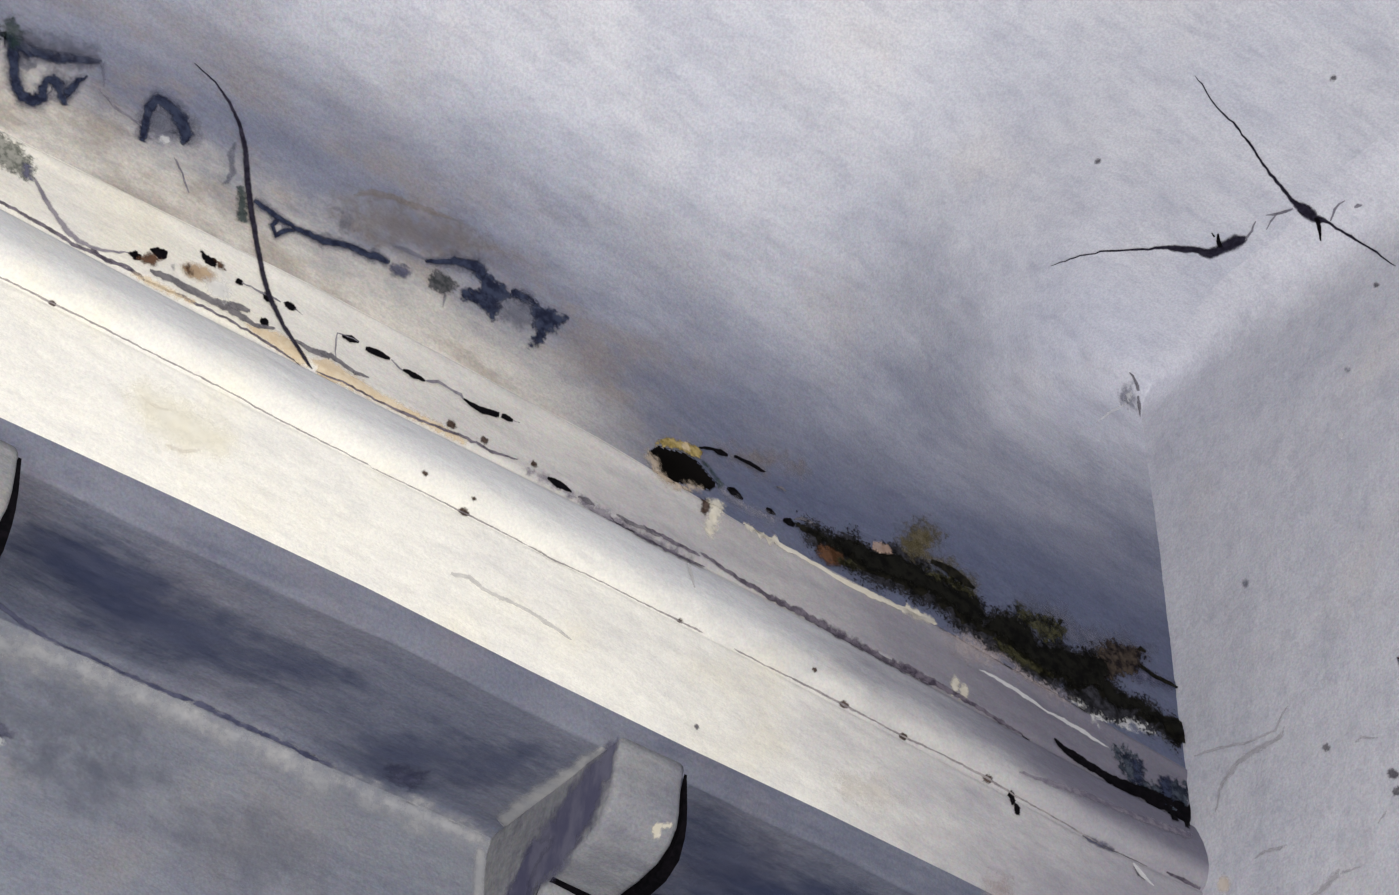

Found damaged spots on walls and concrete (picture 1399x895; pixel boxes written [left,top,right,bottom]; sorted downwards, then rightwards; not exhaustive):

crack [0,63,520,459]
crack [1052,76,1396,266]
crack [0,277,703,639]
spalling [646,437,766,536]
crack [723,486,817,527]
crack [549,774,687,895]
crack [735,649,1146,866]
crack [644,525,1286,829]
leakage [794,510,1185,757]
leakage [1111,743,1189,818]